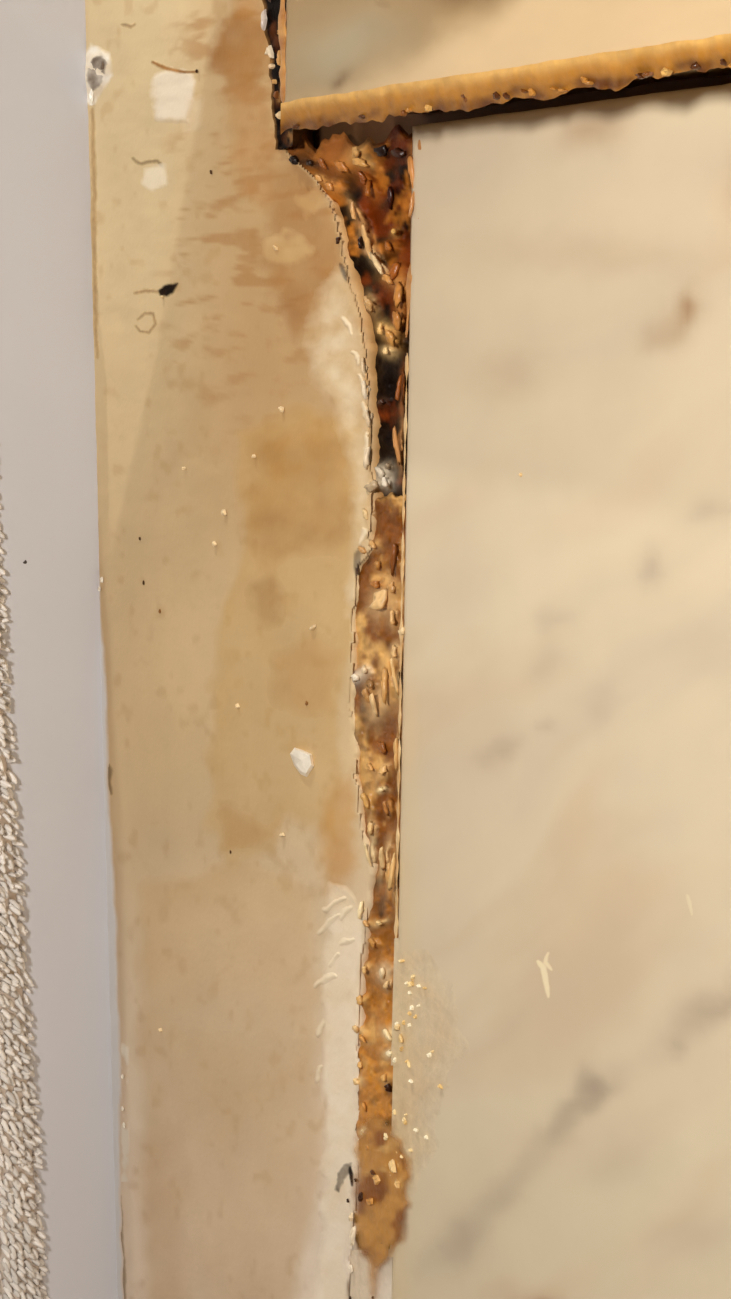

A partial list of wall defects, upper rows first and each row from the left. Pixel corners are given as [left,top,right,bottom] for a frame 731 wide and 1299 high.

damp [122,400,367,1299]
corrosion [348,1118,409,1278]